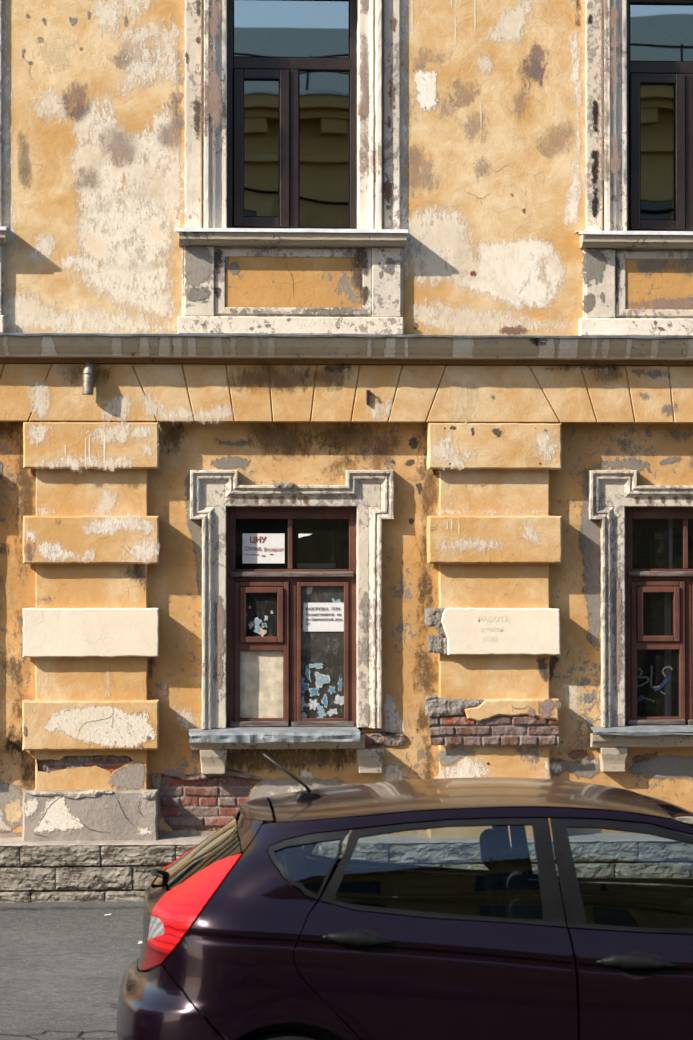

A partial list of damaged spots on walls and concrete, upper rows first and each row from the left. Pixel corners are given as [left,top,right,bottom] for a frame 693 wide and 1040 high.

damp [63,83,92,116]
peeling [357,32,370,170]
damp [518,44,547,86]
peeling [2,0,240,334]
peeling [378,0,567,335]
flaking render [580,248,608,314]
peeling [24,401,231,472]
peeling [579,456,683,691]
flaking render [424,608,448,655]
flaking render [0,704,346,838]
flaking render [425,681,600,779]
flaking render [628,751,693,781]